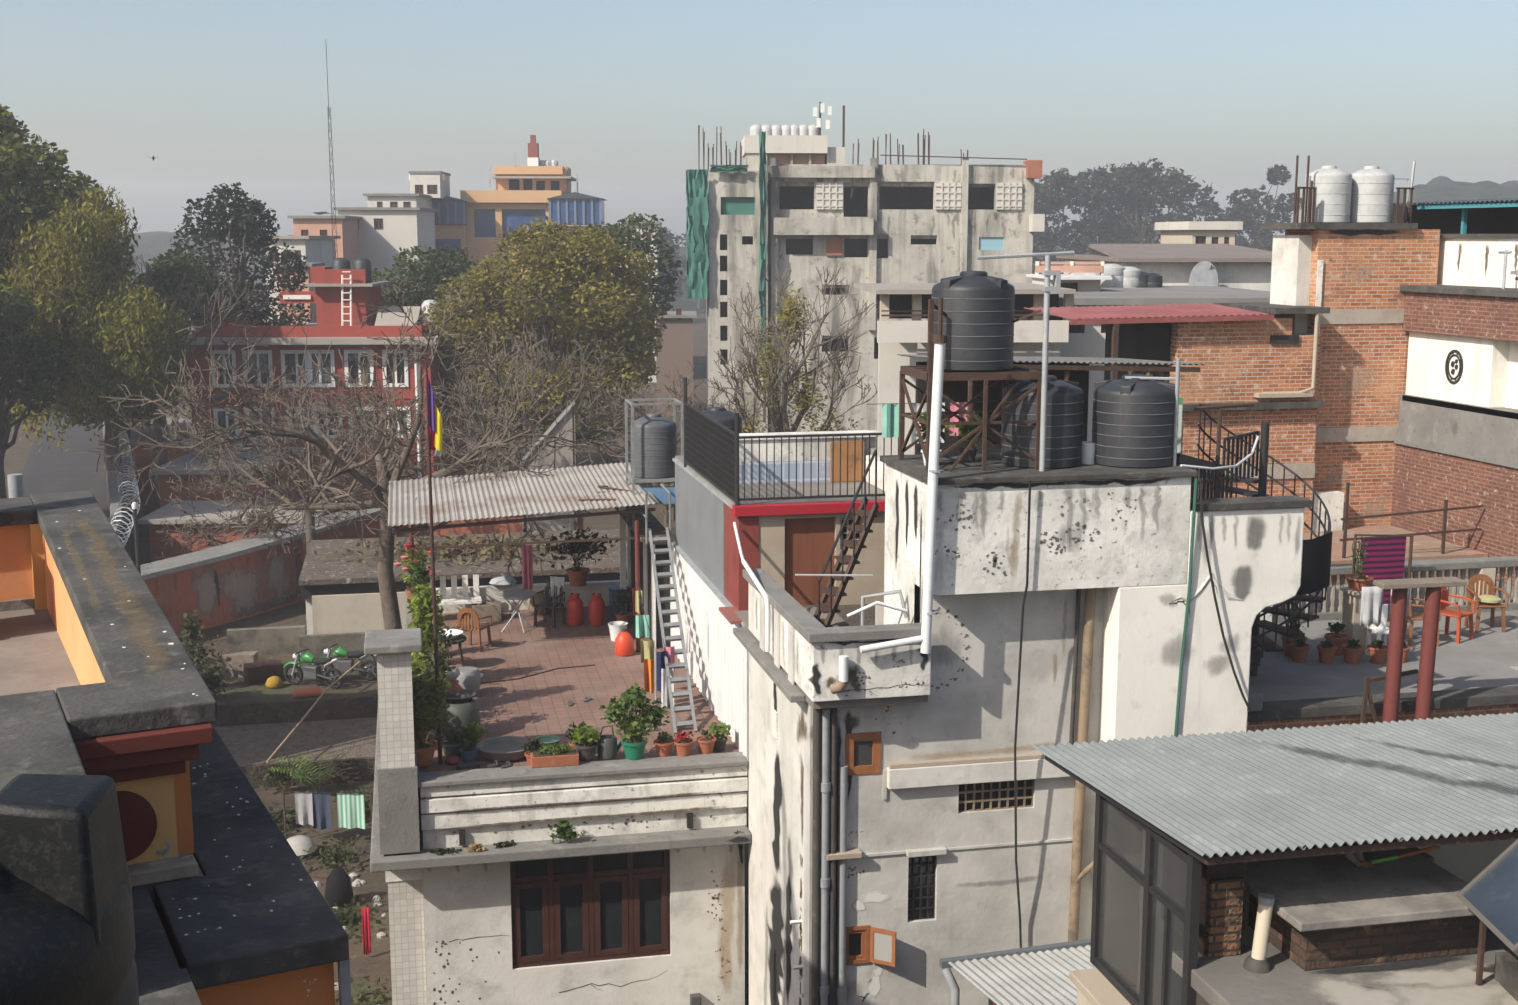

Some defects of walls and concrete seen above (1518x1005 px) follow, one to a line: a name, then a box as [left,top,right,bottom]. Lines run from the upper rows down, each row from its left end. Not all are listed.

water stain [960,478,1169,490]
water stain [1248,518,1264,549]
water stain [1234,567,1251,599]
water stain [729,837,749,864]
water stain [768,755,792,1005]